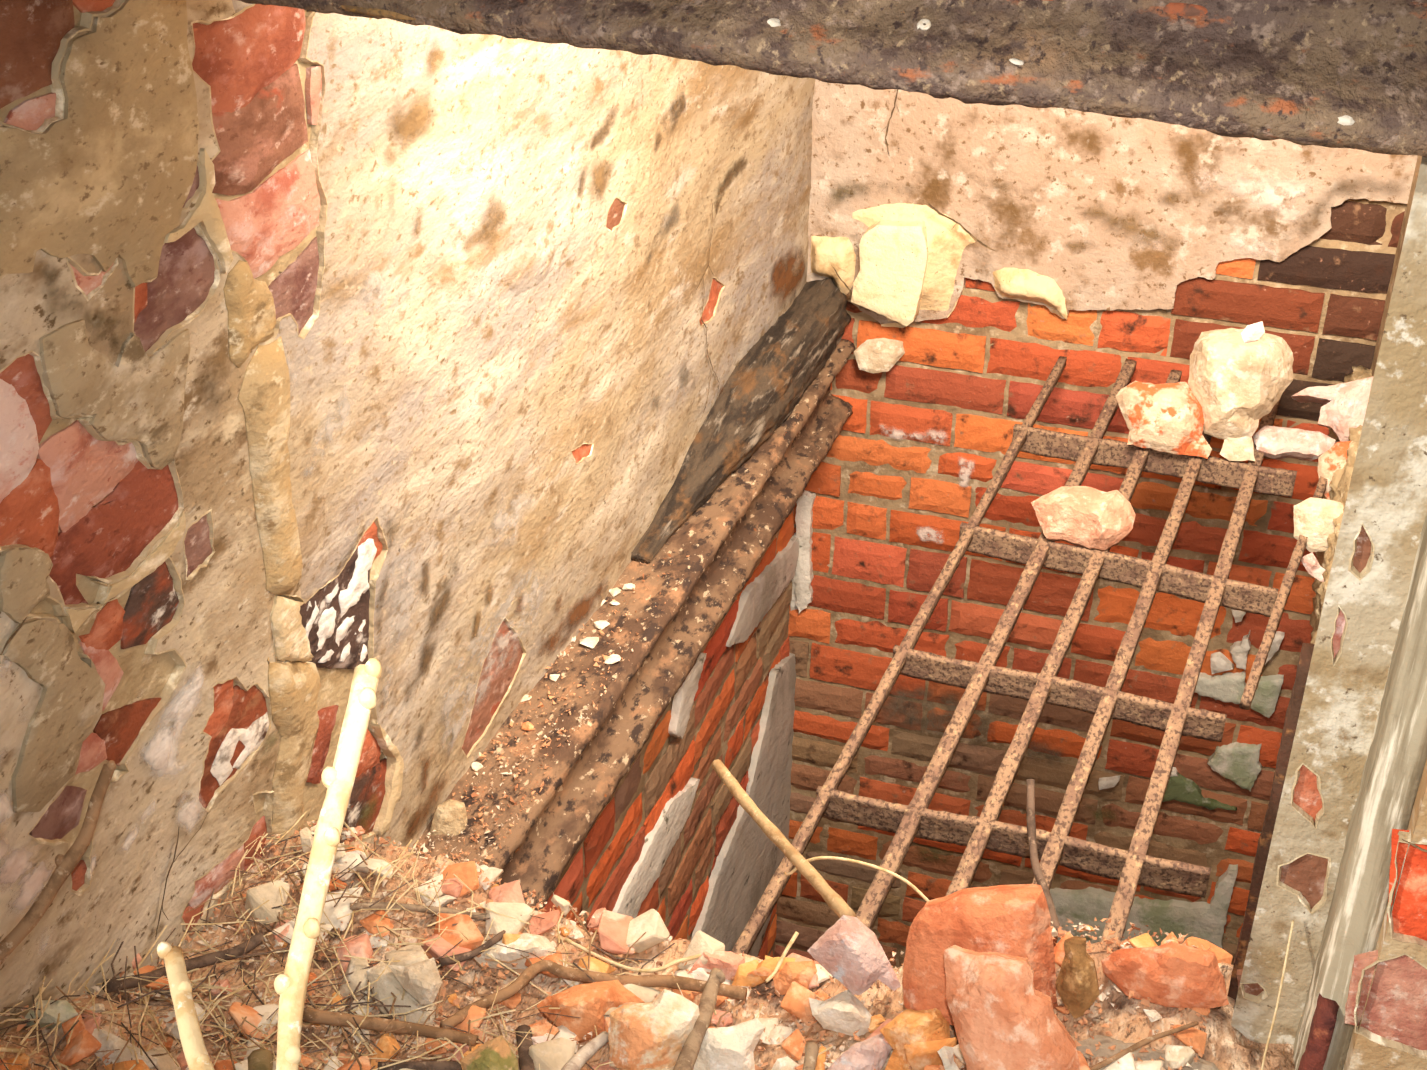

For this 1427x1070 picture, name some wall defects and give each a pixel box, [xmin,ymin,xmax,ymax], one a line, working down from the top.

peeling [806,79,1418,324]
peeling [0,0,328,896]
flaking render [270,517,388,846]
flaking render [1276,852,1332,915]
flaking render [1291,763,1325,829]
flaking render [1344,829,1427,1060]